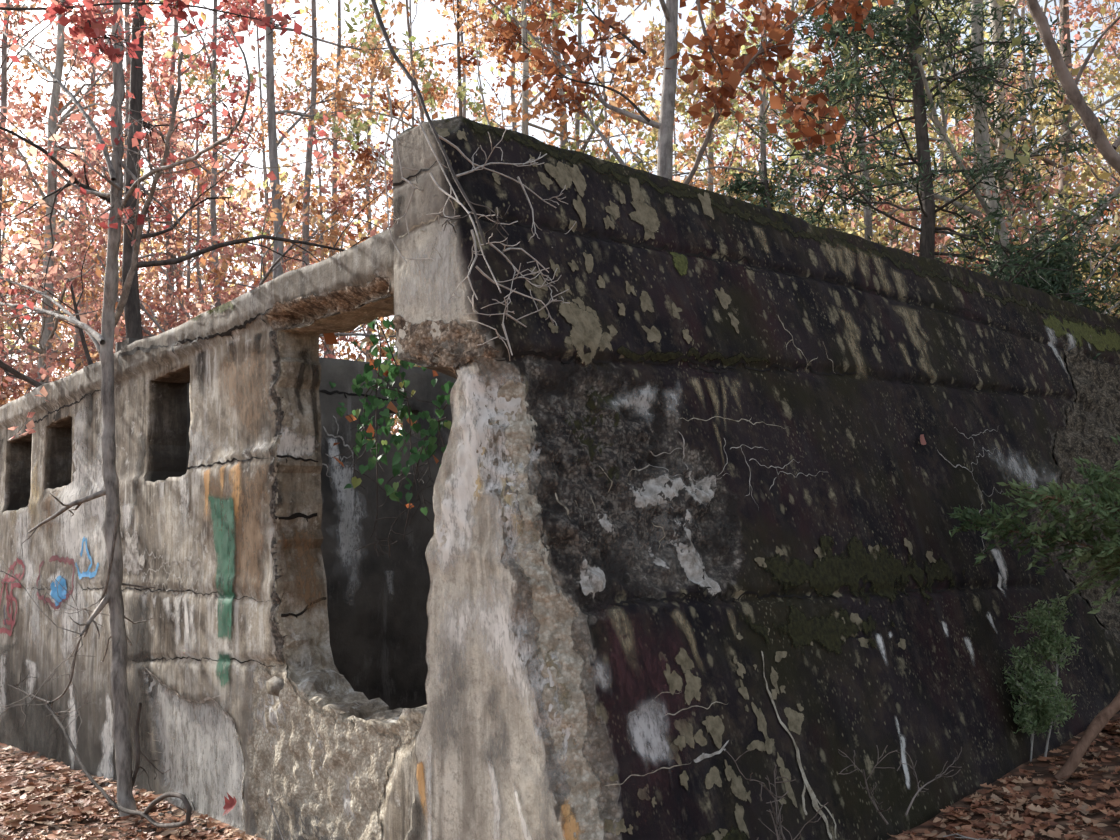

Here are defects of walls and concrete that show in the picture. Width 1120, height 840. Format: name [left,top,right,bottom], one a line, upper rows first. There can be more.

water stain [16,393,106,666]
crack [27,586,326,618]
spalling [145,276,420,840]
crack [275,512,317,522]
water stain [579,559,606,599]
spalling [495,379,726,840]
water stain [627,464,721,596]
crack [132,656,288,667]
water stain [97,695,113,779]
rust [416,761,427,815]
rust [561,801,580,840]
water stain [896,718,910,788]